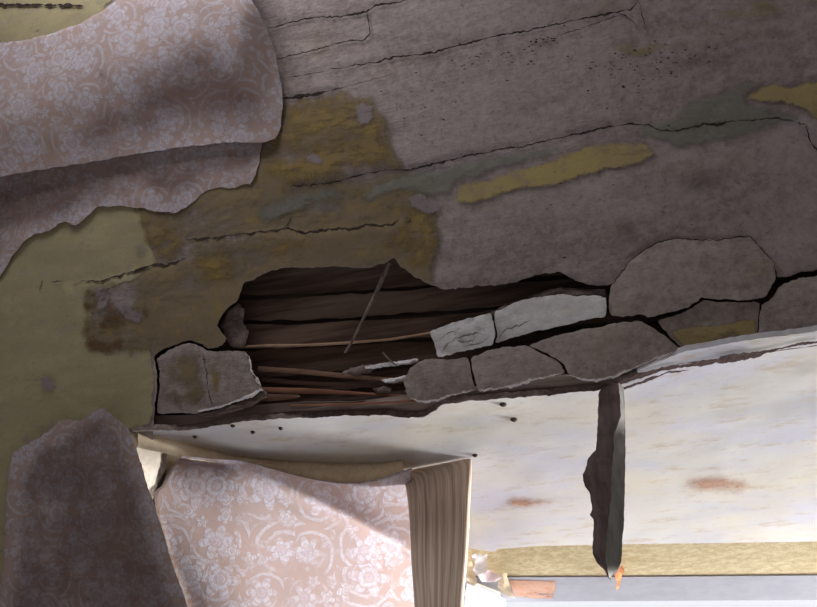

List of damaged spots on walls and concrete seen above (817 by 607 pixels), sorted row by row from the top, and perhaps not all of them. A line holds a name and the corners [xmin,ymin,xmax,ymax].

peeling [0,0,112,43]
crack [272,0,645,99]
peeling [642,82,817,146]
crack [290,117,817,187]
crack [40,215,398,287]
crack [614,236,777,283]
peeling [0,91,654,584]
rust [699,480,738,488]